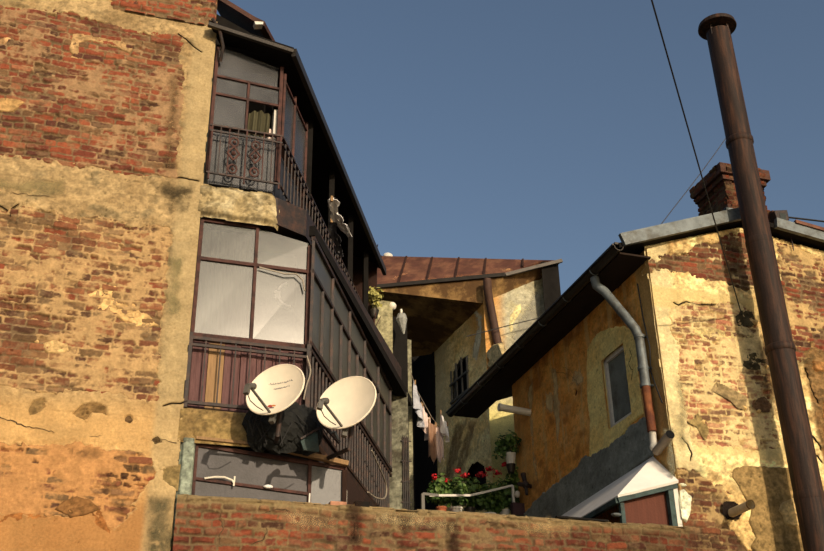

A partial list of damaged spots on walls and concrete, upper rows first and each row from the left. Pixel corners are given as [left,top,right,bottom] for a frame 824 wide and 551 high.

flaking render [0,5,185,179]
flaking render [0,206,173,415]
flaking render [648,232,754,292]
flaking render [776,243,824,362]
crack [0,417,55,433]
spalling [73,403,106,423]
flaking render [669,300,780,453]
flaking render [0,441,181,533]